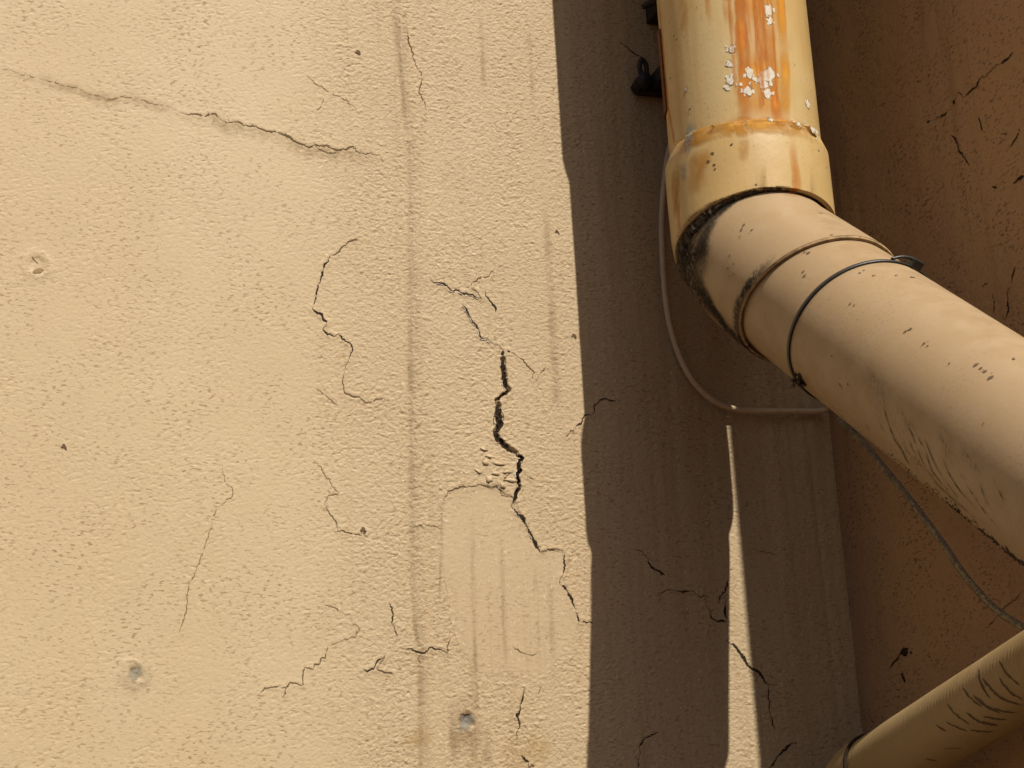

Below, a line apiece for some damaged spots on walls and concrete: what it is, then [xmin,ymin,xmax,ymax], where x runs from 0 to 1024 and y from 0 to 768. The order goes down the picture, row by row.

peeling [764,3,775,25]
crack [2,69,383,160]
rust [688,0,803,172]
peeling [723,42,779,99]
crack [927,53,1020,165]
crack [312,238,389,403]
crack [413,269,592,623]
crack [567,398,616,436]
crack [317,462,366,535]
crack [260,605,360,696]
crack [362,603,450,674]
crack [636,549,797,768]